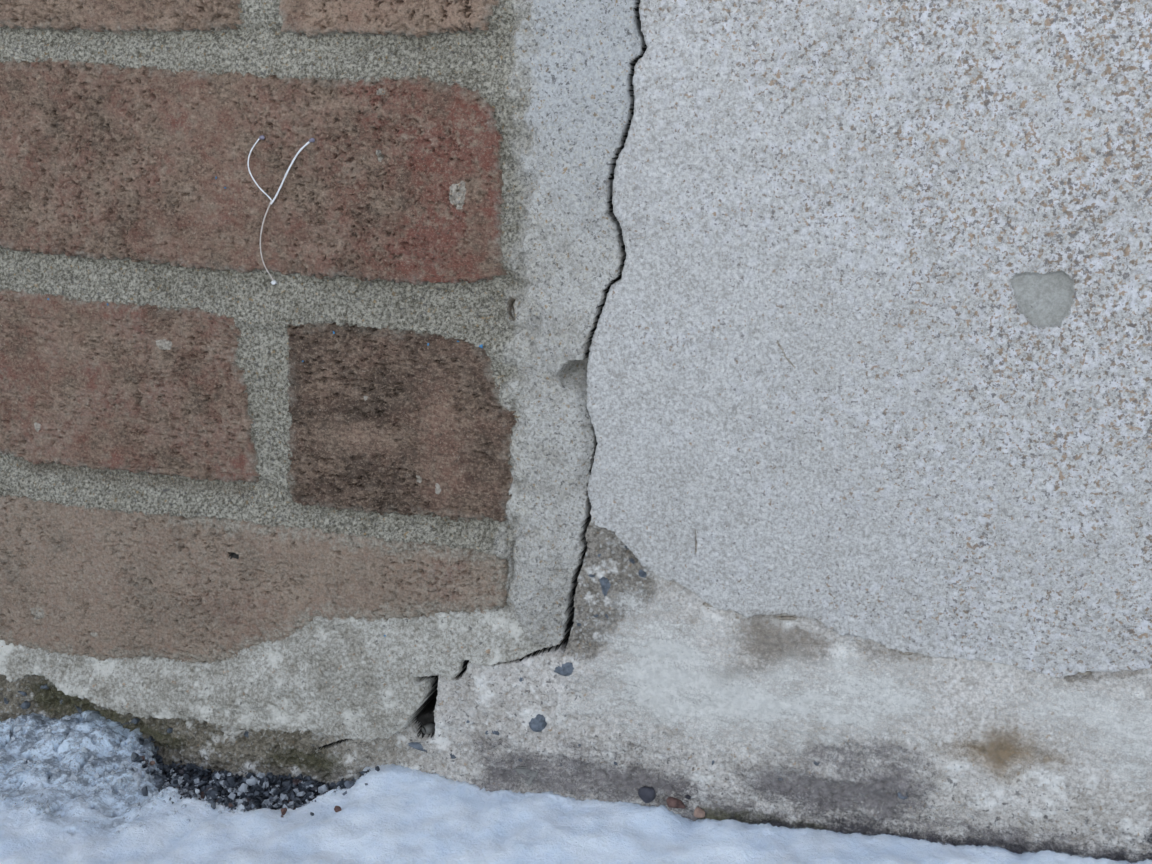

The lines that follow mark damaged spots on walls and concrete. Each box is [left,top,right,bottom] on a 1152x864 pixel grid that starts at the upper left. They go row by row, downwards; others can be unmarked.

crack [567,2,648,358]
crack [456,504,592,677]
spalling [563,518,1152,684]
hole [409,675,439,738]
leakage [473,590,1152,863]